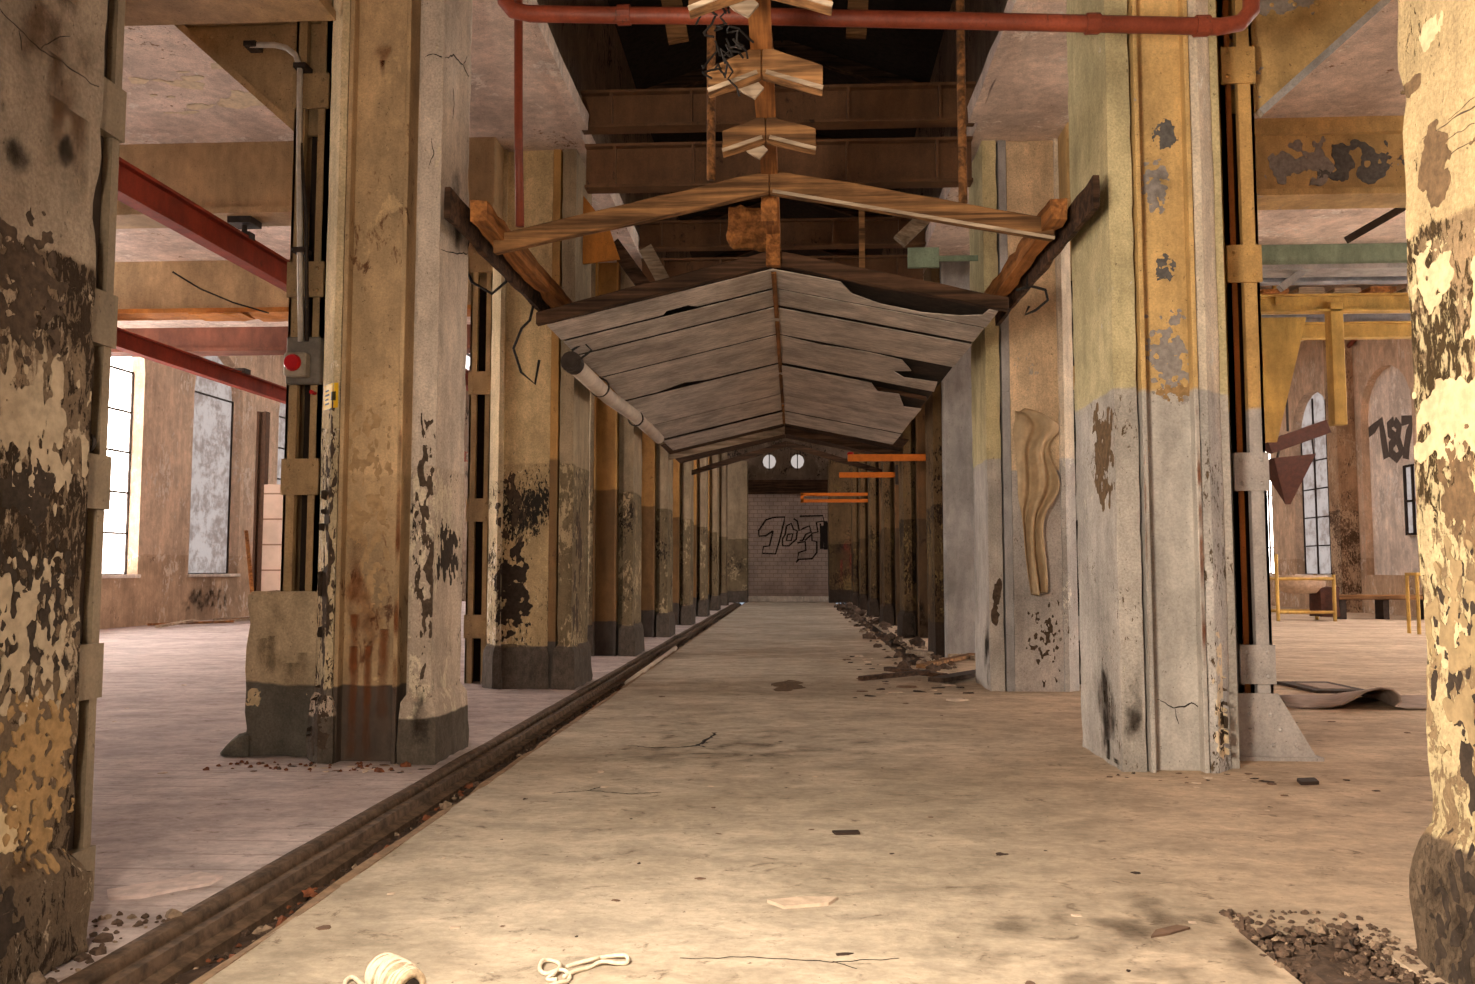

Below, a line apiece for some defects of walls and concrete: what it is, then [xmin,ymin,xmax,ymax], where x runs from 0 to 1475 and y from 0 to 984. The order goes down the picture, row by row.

peeling [1419,10,1443,52]
peeling [1141,118,1178,214]
spalling [1267,119,1452,207]
peeling [1156,253,1176,281]
peeling [1412,240,1475,340]
peeling [1144,309,1189,405]
spalling [1092,402,1115,512]
peeling [0,207,92,875]
peeling [414,413,462,680]
peeling [493,469,533,642]
peeling [1026,600,1060,688]
peeling [1412,376,1475,984]